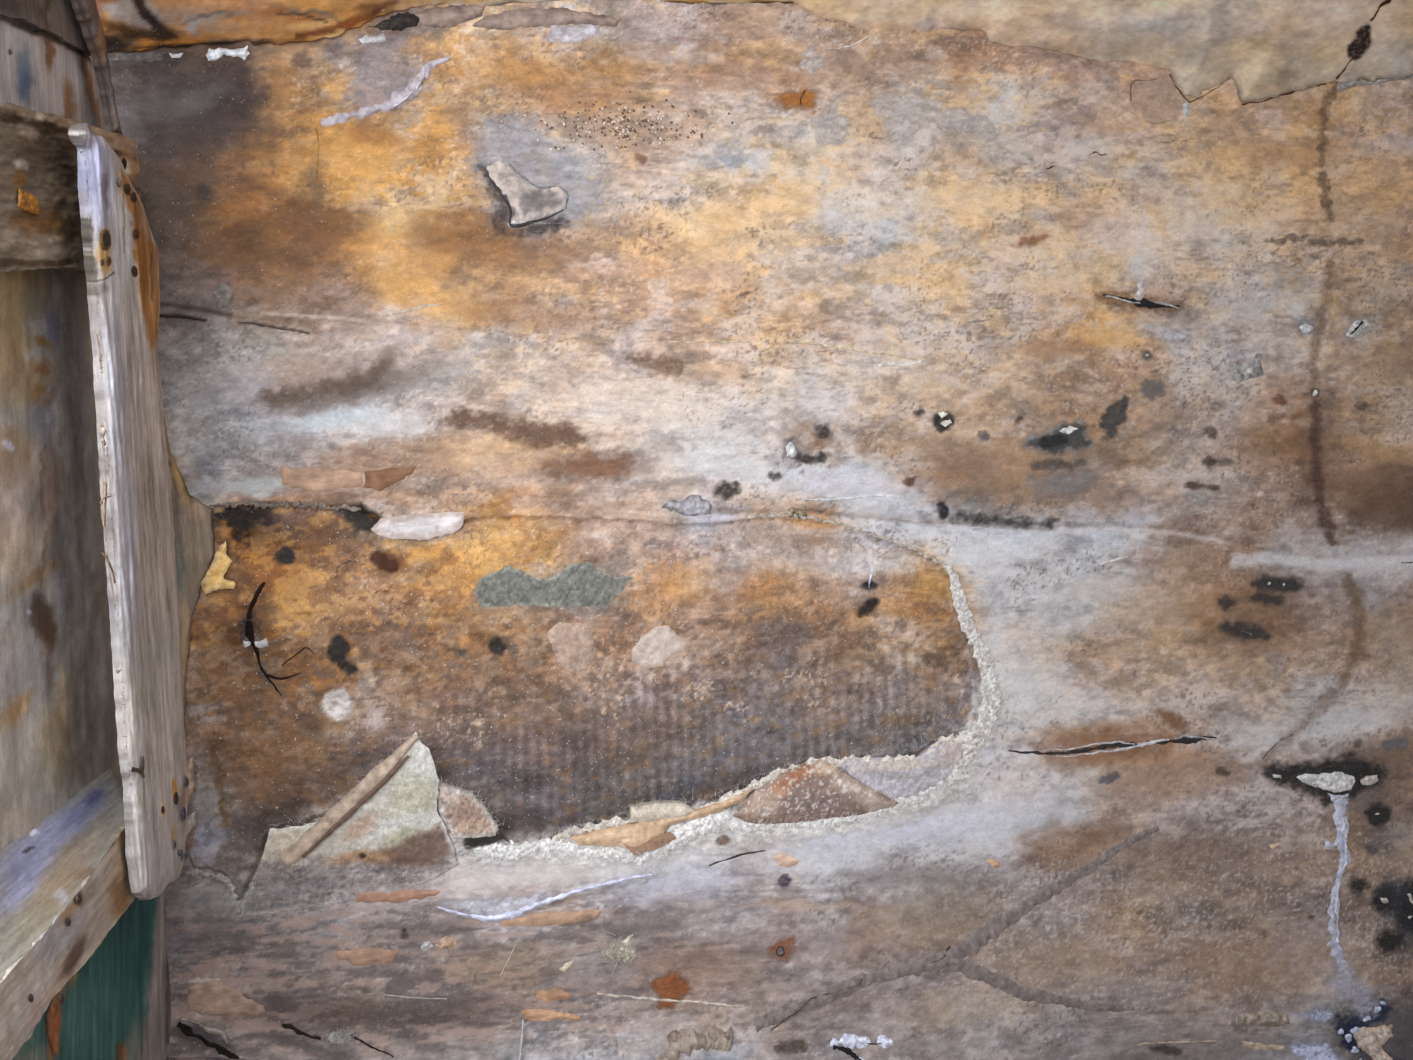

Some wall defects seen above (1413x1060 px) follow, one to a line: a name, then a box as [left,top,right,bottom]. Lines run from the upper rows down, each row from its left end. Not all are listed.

crack [1370,0,1391,21]
corrosion [779,89,815,112]
crack [1170,57,1354,105]
water stain [1317,91,1335,221]
spalling [485,161,568,228]
crack [1102,277,1182,311]
water stain [1311,399,1337,545]
peeling [371,512,465,541]
peeling [201,541,236,595]
crack [1008,729,1217,760]
peeling [733,758,898,824]
peeling [240,732,498,917]